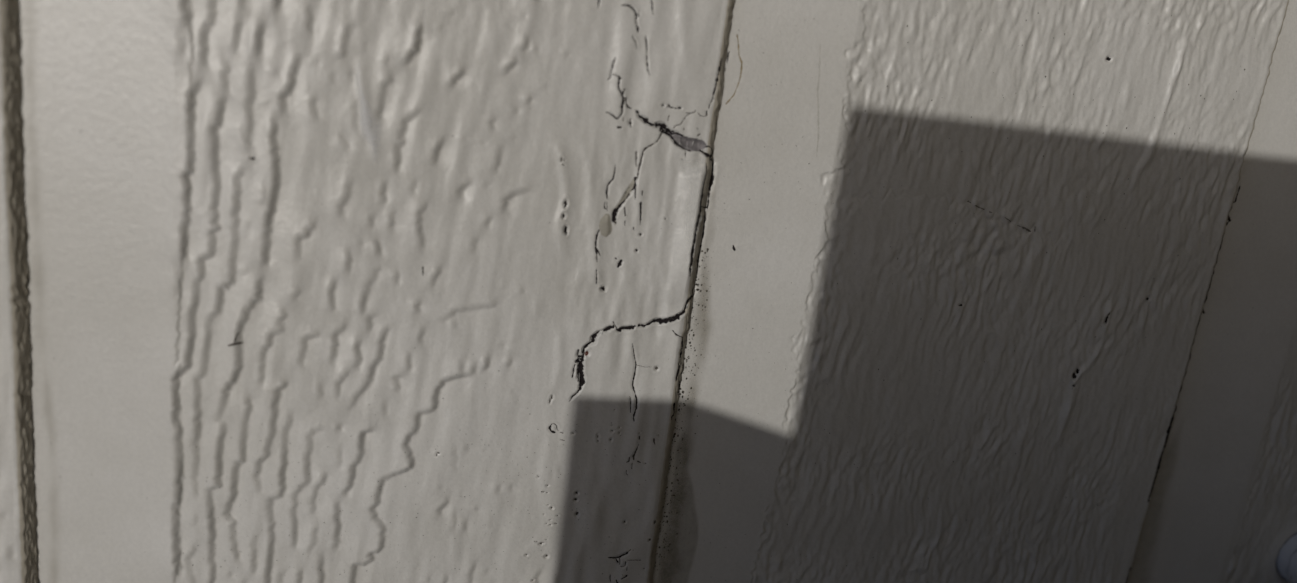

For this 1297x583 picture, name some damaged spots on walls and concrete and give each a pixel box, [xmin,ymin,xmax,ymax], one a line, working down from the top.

crack [595,0,730,284]
crack [548,285,695,474]